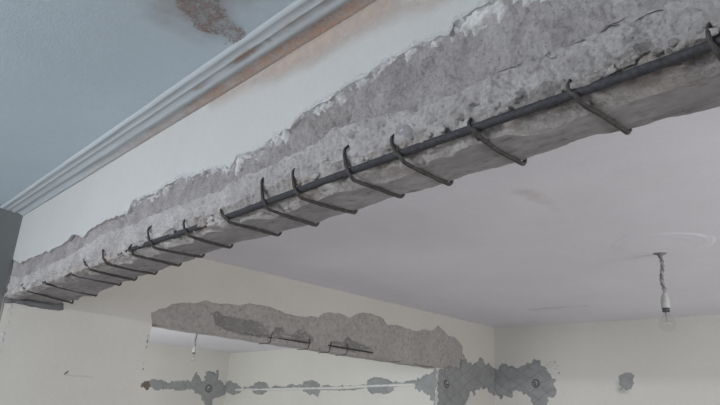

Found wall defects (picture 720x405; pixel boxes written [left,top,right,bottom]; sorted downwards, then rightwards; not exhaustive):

corrosion [176,0,245,43]
flaking render [4,0,720,311]
flaking render [151,300,462,369]